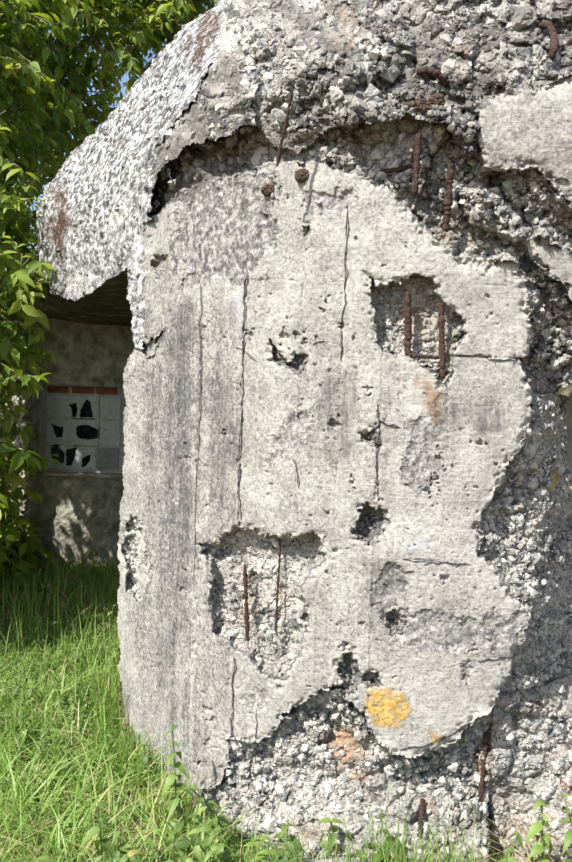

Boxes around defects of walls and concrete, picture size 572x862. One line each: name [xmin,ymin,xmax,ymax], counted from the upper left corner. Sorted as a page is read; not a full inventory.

spalling [38,149,115,295]
spalling [104,146,152,265]
crack [235,261,256,519]
spalling [121,0,572,862]